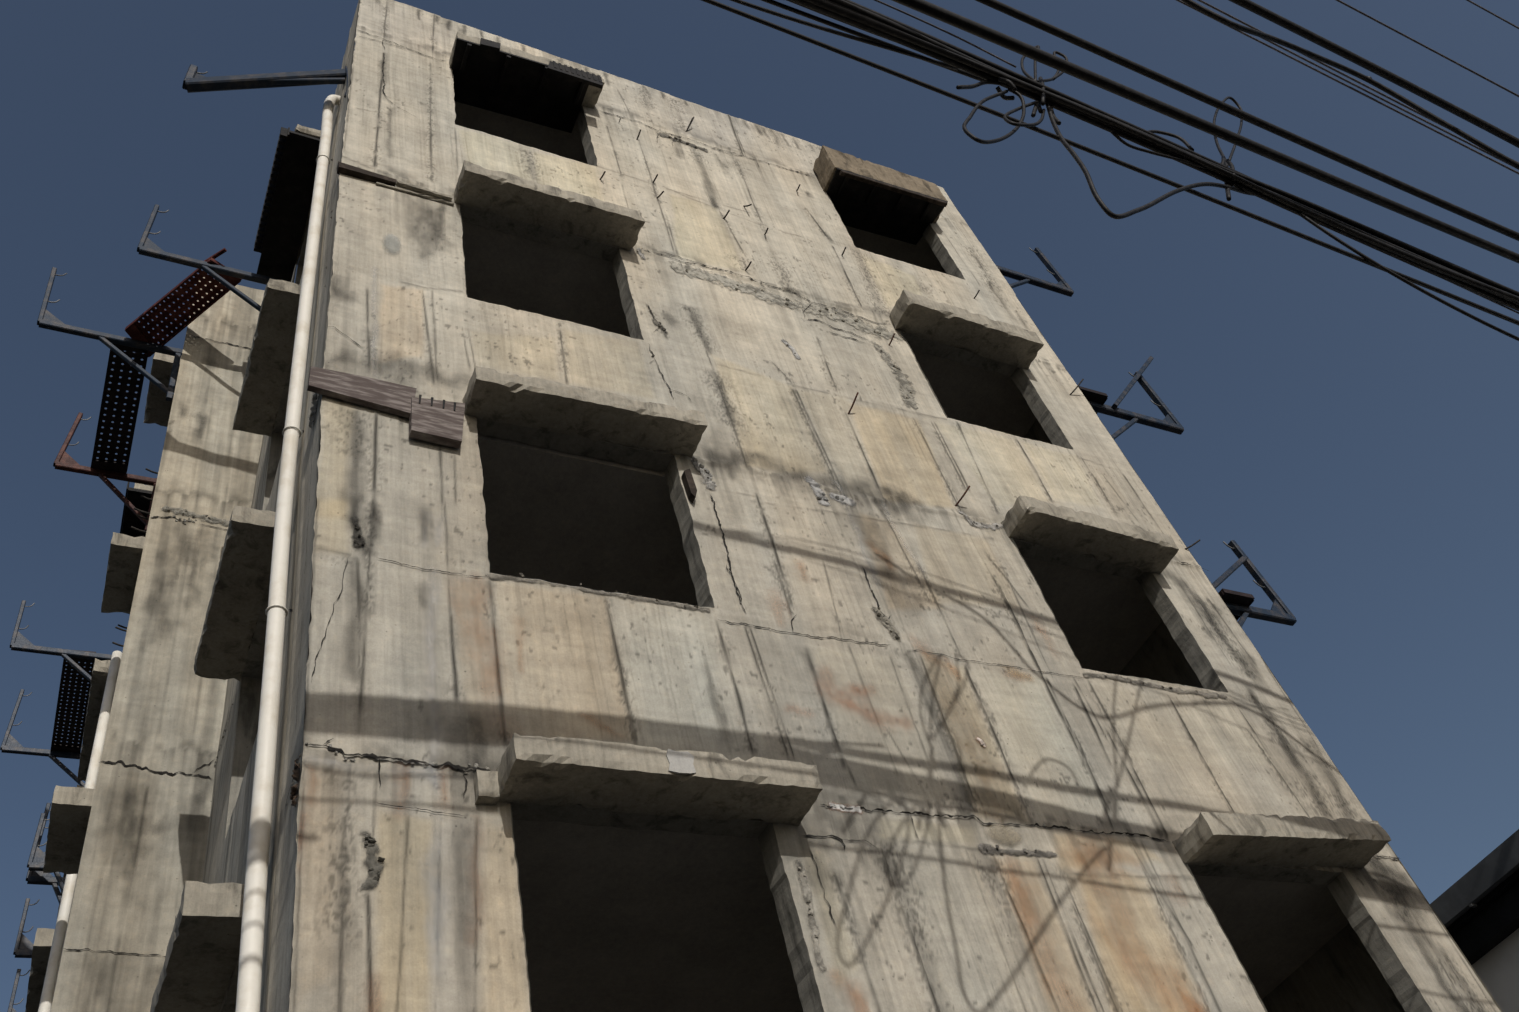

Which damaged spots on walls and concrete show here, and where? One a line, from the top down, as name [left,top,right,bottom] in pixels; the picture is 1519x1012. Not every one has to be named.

spalling [670,261,918,409]
crack [150,515,227,530]
crack [284,432,490,816]
crack [101,702,233,779]
spalling [360,831,385,890]